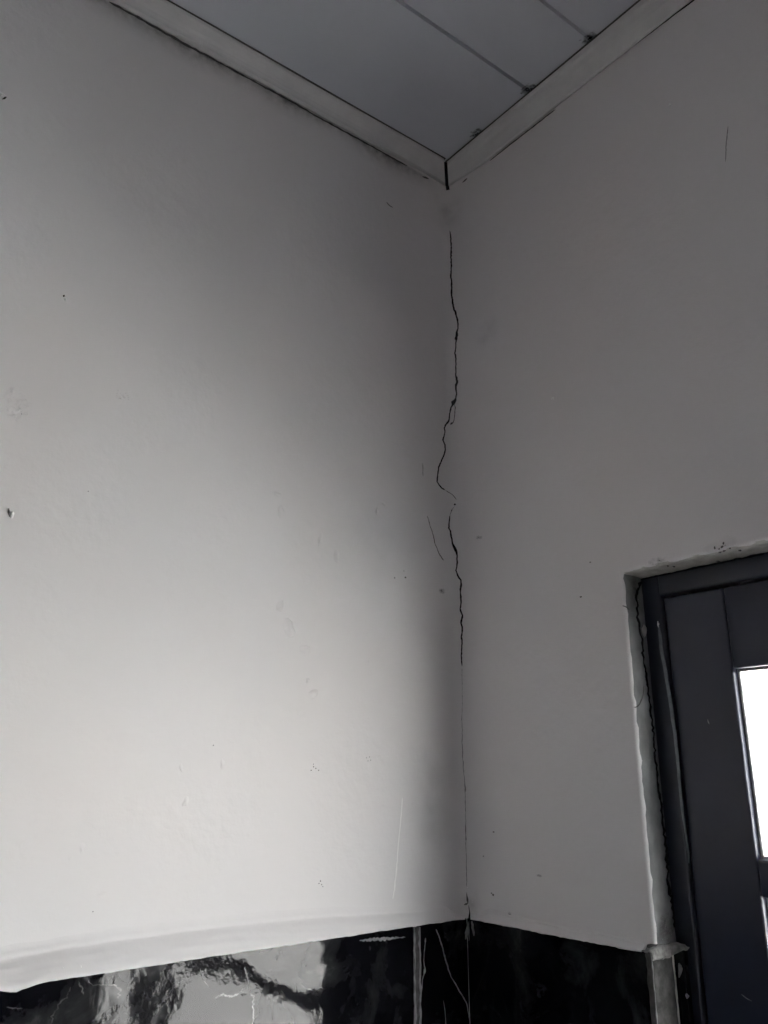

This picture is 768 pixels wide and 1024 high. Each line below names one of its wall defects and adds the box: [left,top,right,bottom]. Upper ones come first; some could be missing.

crack [422,232,470,918]